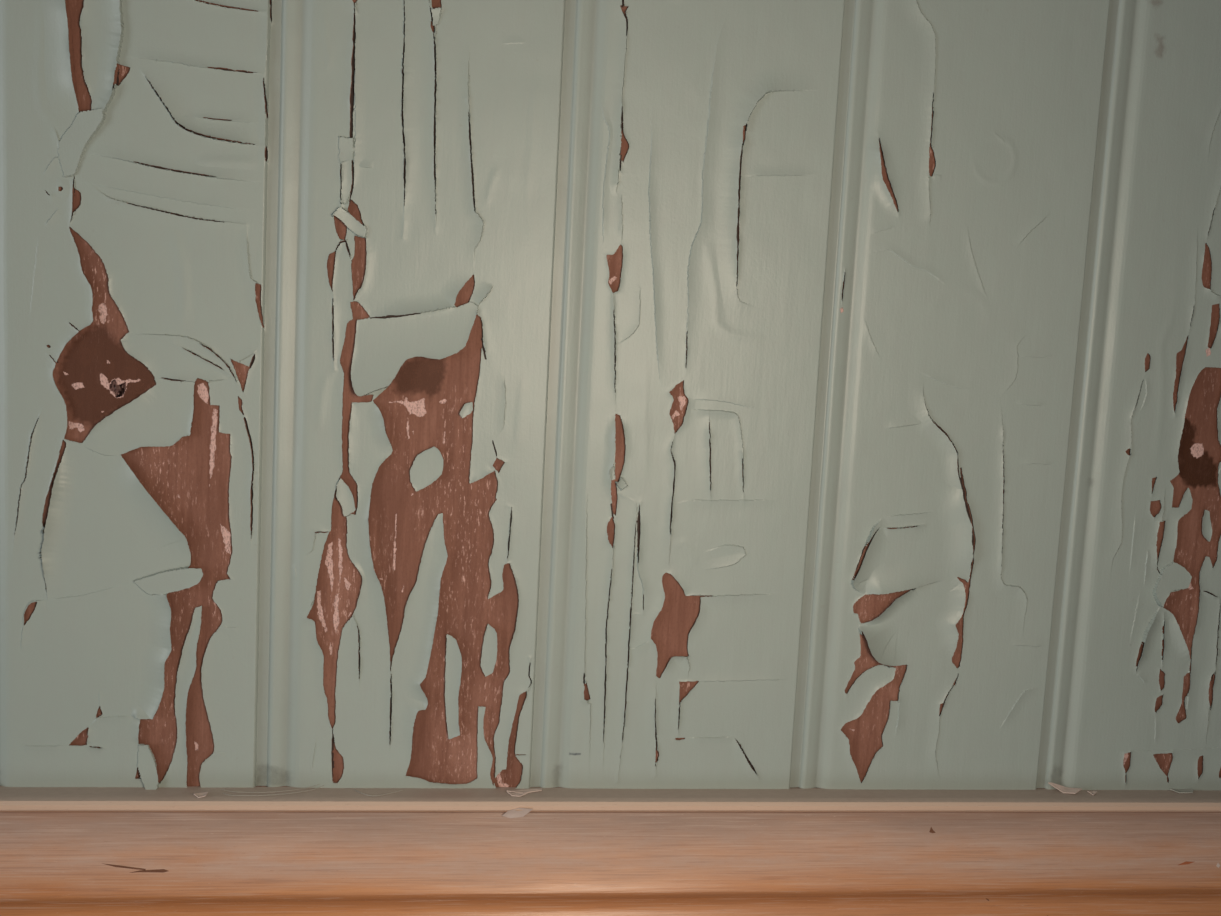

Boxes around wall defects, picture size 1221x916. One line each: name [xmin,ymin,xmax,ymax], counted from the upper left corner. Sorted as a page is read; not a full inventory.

peeling [21,0,257,798]
crack [94,187,238,233]
crack [84,0,272,182]
peeling [240,232,265,328]
peeling [293,138,542,818]
crack [617,500,758,776]
crack [601,0,811,380]
peeling [644,381,785,732]
peeling [841,512,941,781]
crack [867,0,941,224]
crack [887,387,1042,774]
peeling [1123,236,1221,775]